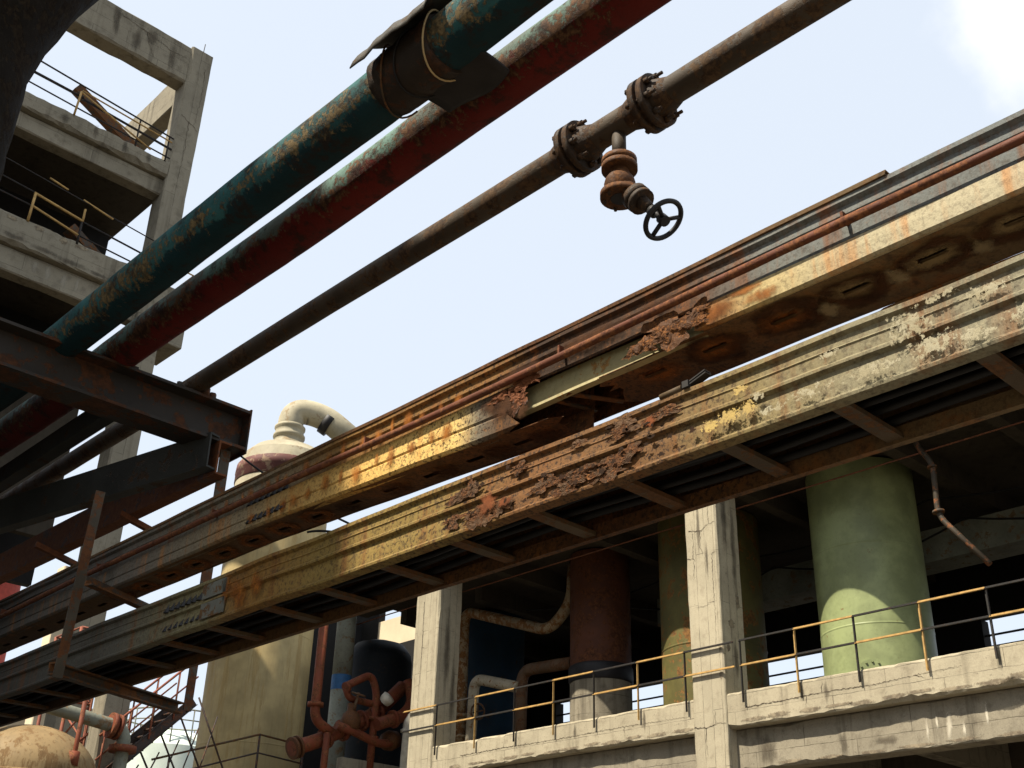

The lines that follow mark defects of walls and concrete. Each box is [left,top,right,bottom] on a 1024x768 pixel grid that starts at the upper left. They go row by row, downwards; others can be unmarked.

peeling [974,215,1024,252]
peeling [888,247,955,283]
rust [644,208,1024,381]
rust [563,292,681,351]
peeling [700,276,1024,432]
rust [532,430,563,443]
rust [605,416,685,459]
rust [383,484,411,494]
rust [434,466,460,477]
rust [463,447,631,515]